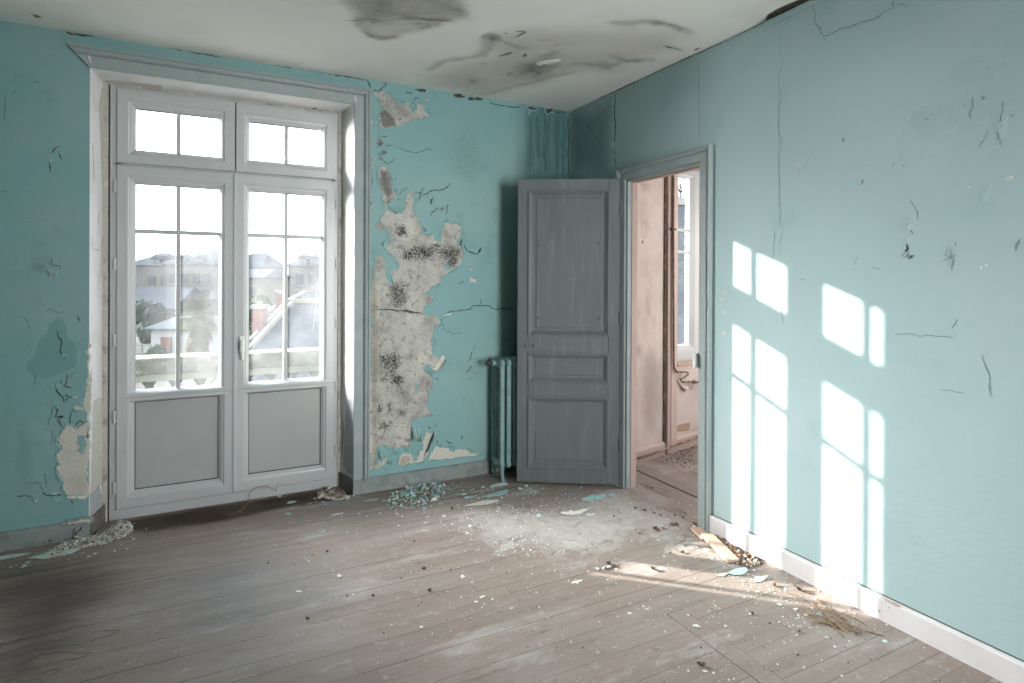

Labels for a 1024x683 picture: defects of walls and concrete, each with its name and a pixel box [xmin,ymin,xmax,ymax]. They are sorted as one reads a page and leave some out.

crack [600,0,911,258]
damp [389,282,417,314]
peeling [359,79,484,472]
damp [403,244,461,267]
damp [23,314,80,381]
damp [382,355,403,390]
crack [441,299,511,371]
peeling [16,343,135,552]